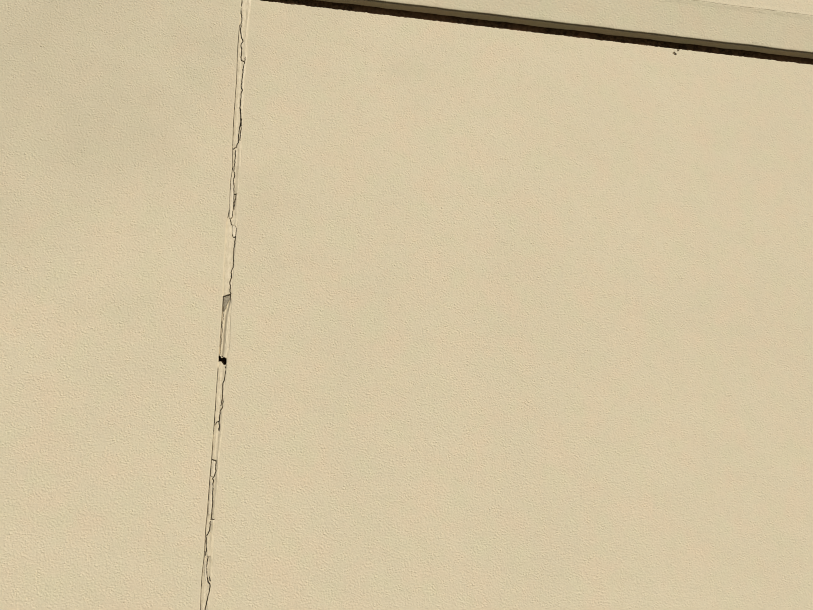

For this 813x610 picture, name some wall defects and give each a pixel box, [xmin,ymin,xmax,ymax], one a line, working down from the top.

crack [228,4,245,290]
crack [200,367,226,610]